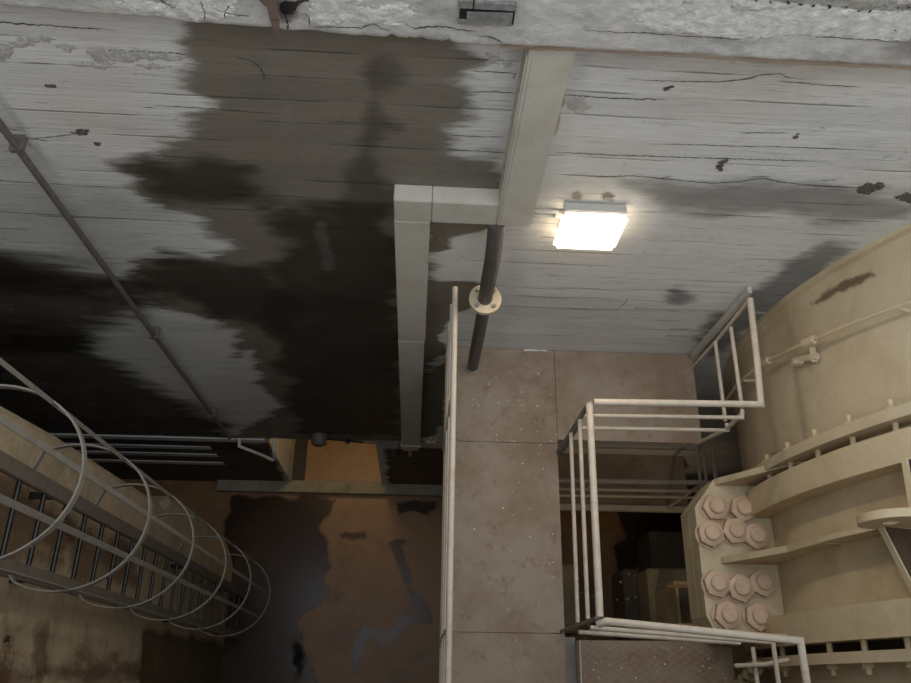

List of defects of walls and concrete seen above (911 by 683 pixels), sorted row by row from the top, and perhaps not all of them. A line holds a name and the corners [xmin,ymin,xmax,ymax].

flaking render [114,0,238,23]
flaking render [632,0,911,44]
spalling [855,182,885,195]
spalling [894,192,911,204]
leakage [0,22,501,485]
leakage [398,500,436,514]